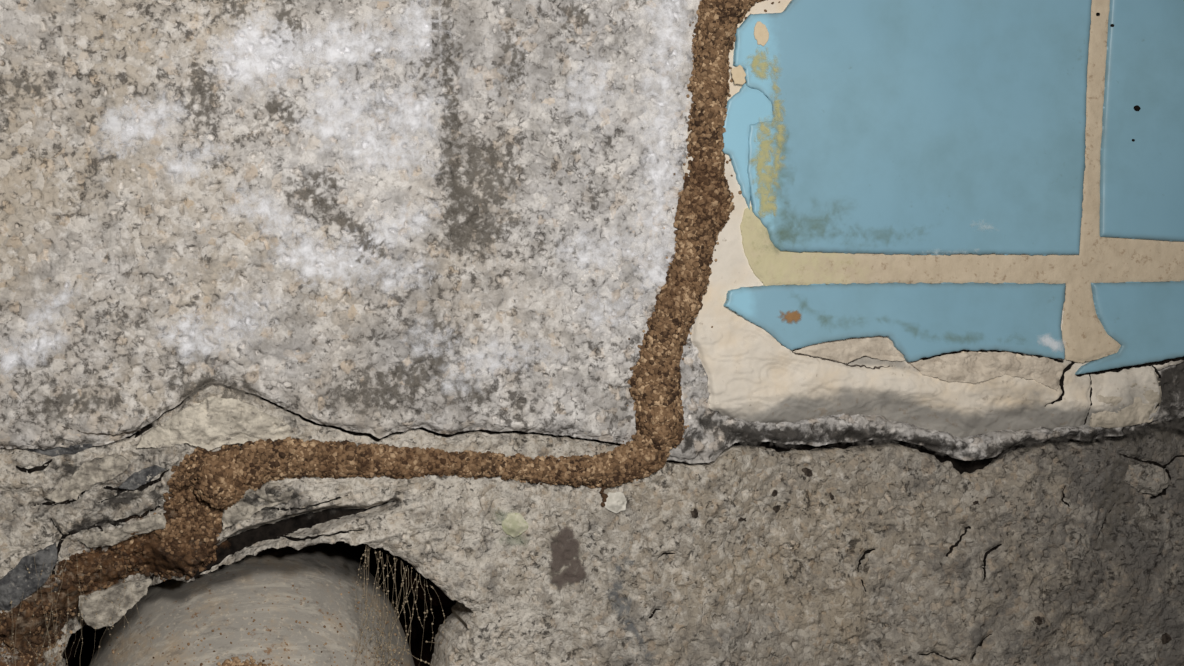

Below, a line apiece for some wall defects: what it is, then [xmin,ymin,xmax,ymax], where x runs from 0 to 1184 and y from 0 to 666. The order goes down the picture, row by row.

water stain [106,0,525,263]
water stain [538,0,685,287]
water stain [232,170,426,288]
crack [16,459,52,474]
water stain [2,282,69,370]
crack [62,383,621,446]
water stain [315,314,513,414]
crack [792,341,890,369]
peeling [793,336,1063,390]
crack [732,350,1184,537]
peeling [1089,368,1162,429]
crack [34,469,169,575]